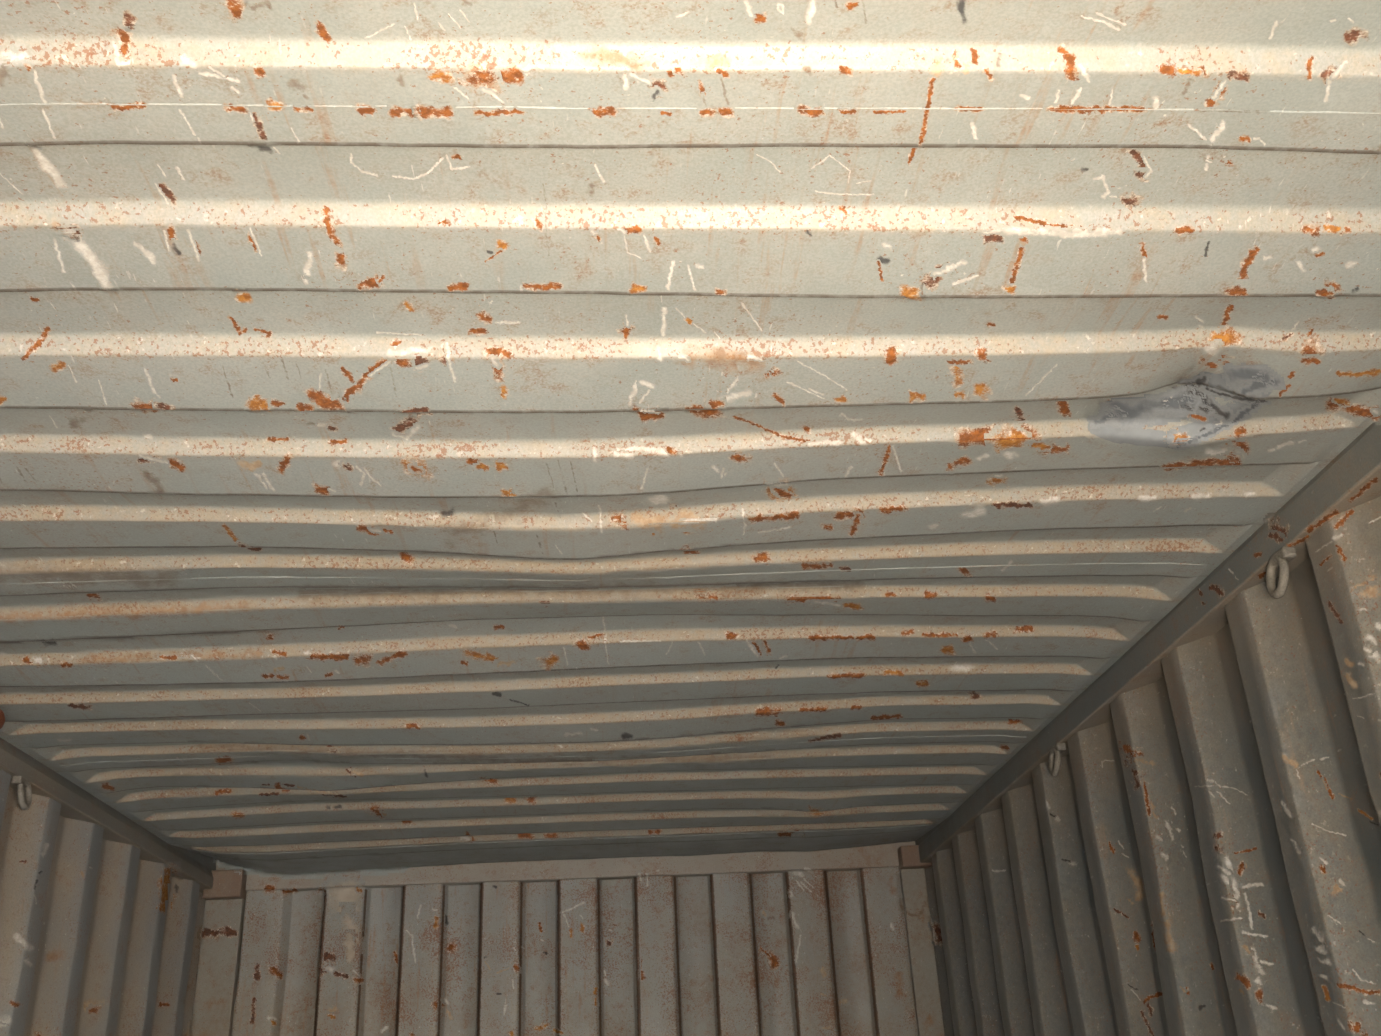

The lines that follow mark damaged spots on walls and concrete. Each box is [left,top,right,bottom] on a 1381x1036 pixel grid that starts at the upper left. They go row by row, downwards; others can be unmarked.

corrosion [107,100,150,114]
corrosion [353,58,532,124]
corrosion [794,44,1006,167]
corrosion [1043,101,1149,117]
corrosion [999,149,1155,297]
corrosion [18,324,71,377]
corrosion [242,336,438,447]
corrosion [943,345,996,403]
corrosion [264,435,299,481]
corrosion [940,401,1075,512]
corrosion [782,594,867,613]
corrosion [391,882,485,1036]